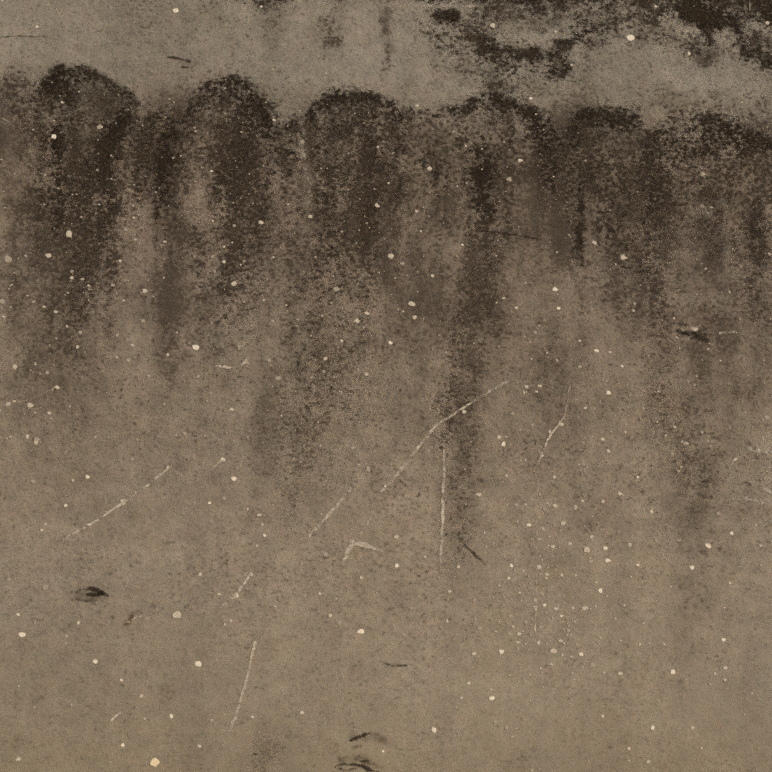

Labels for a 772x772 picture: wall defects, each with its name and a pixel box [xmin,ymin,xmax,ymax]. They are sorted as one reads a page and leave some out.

damp [32,65,420,314]
damp [407,0,772,475]